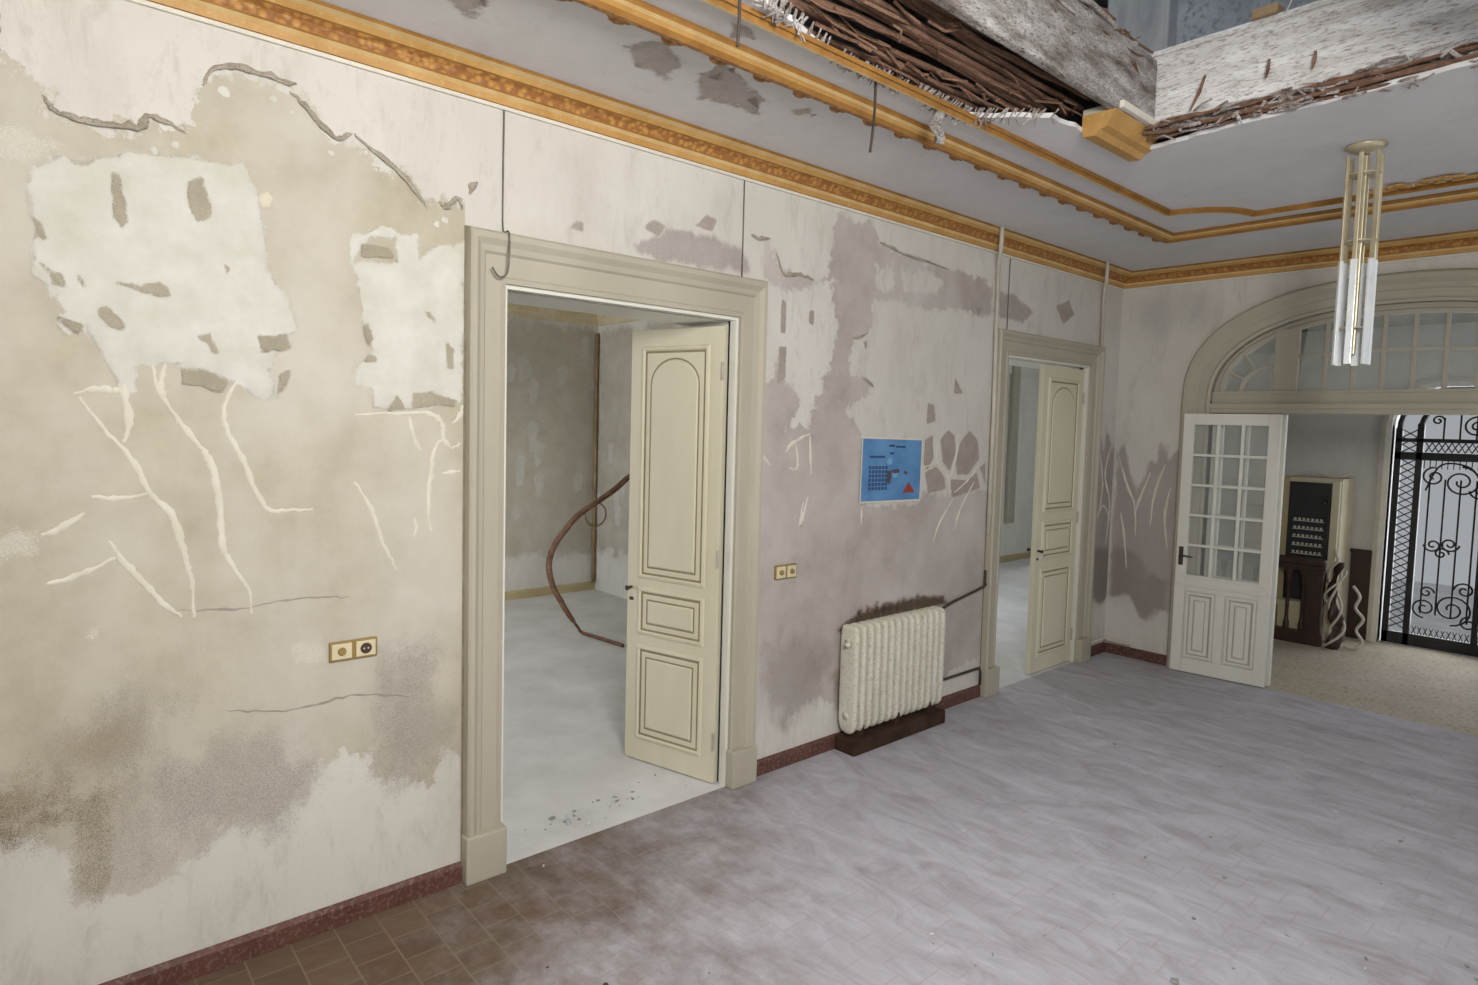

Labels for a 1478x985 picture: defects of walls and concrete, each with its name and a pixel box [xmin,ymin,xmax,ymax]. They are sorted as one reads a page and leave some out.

peeling [446,0,489,20]
peeling [623,40,766,115]
crack [182,596,351,612]
peeling [633,210,1034,726]
leakage [1092,431,1179,623]
leakage [0,622,461,915]